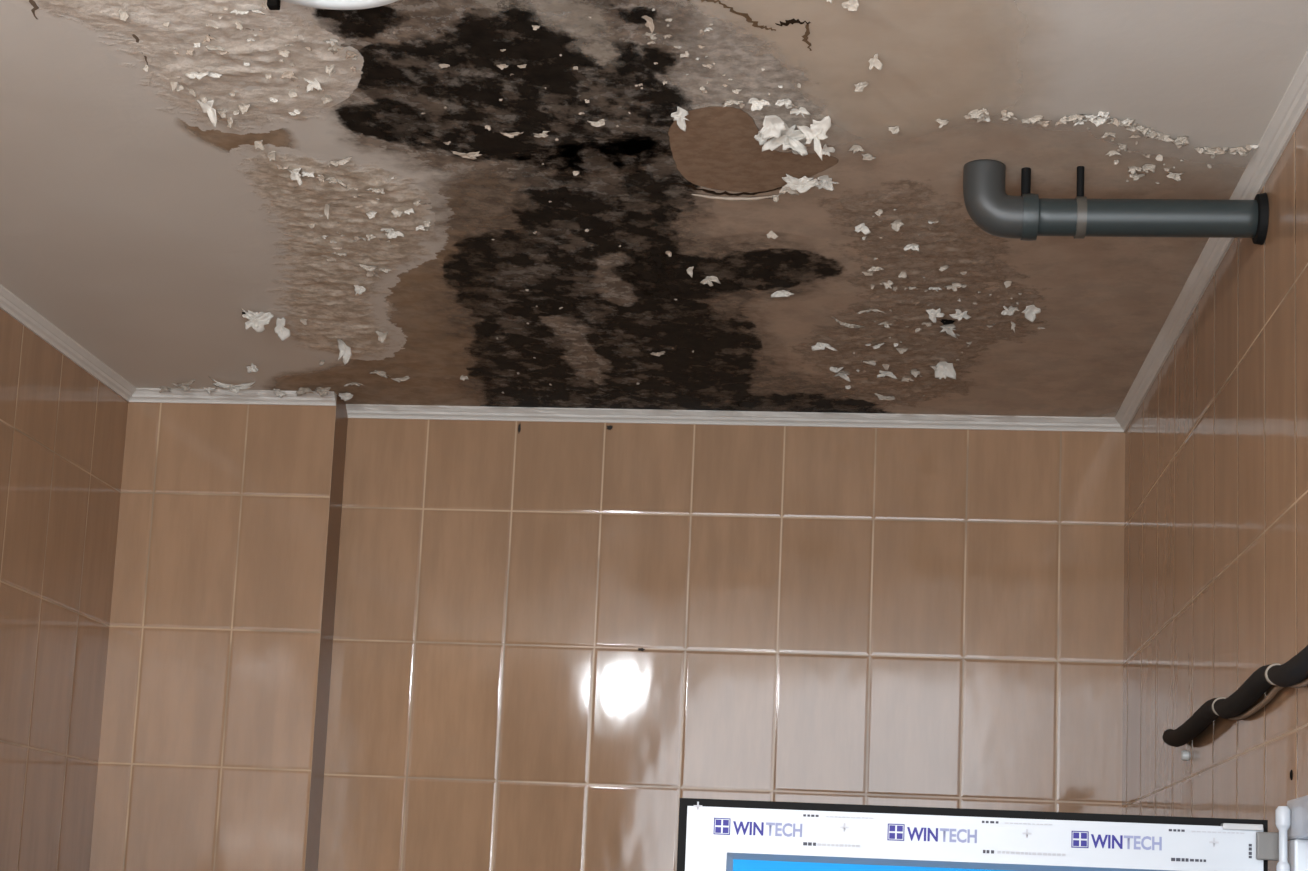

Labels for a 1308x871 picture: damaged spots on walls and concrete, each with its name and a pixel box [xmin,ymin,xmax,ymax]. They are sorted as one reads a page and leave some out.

peeling [826,0,859,11]
peeling [443,141,482,160]
peeling [484,125,559,141]
peeling [579,99,619,127]
peeling [935,108,1259,184]
peeling [8,0,454,401]
water stain [271,0,1243,417]
peeling [640,2,1045,405]